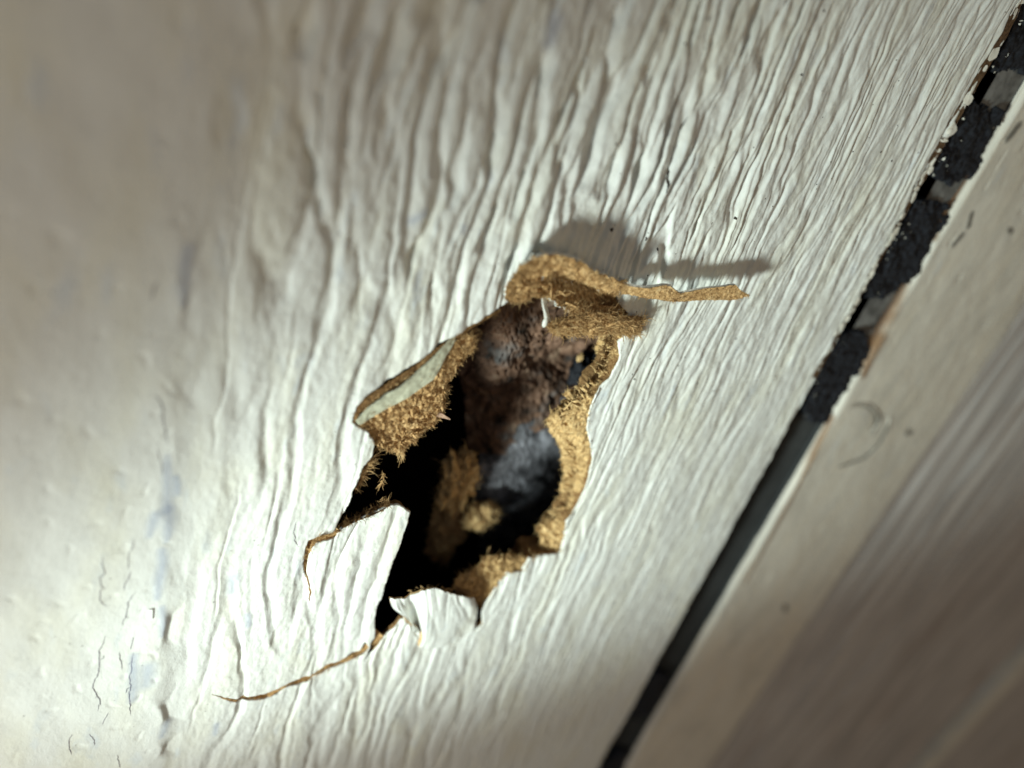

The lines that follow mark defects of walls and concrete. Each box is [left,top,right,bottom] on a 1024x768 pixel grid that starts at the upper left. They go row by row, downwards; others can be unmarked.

peeling [503,250,750,344]
spalling [365,339,449,398]
spalling [337,371,514,650]